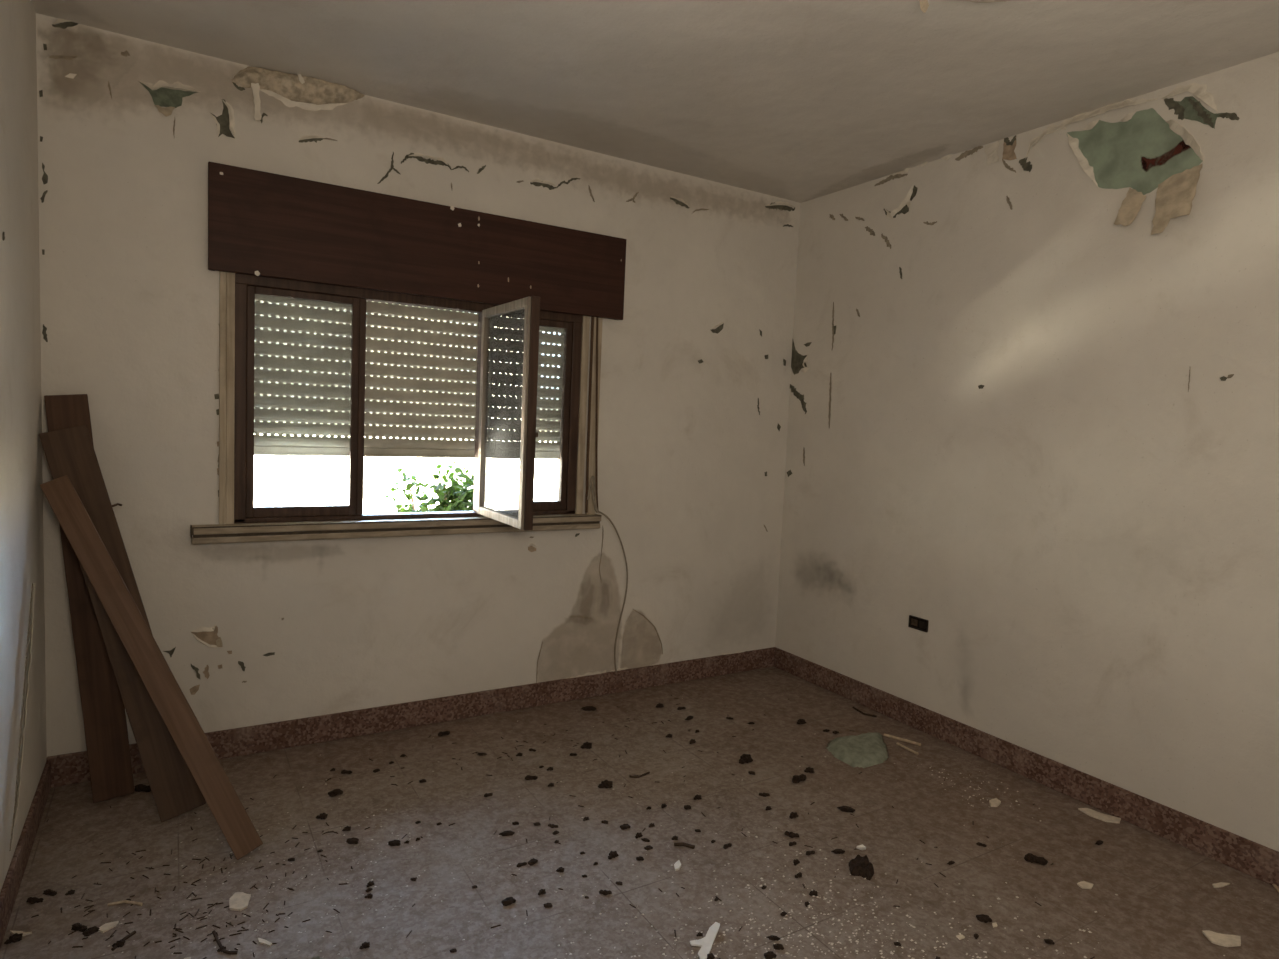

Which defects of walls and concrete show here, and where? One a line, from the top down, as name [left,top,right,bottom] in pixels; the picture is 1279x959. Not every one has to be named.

peeling [138,80,200,137]
peeling [210,98,236,138]
peeling [1032,83,1222,235]
peeling [189,624,247,695]